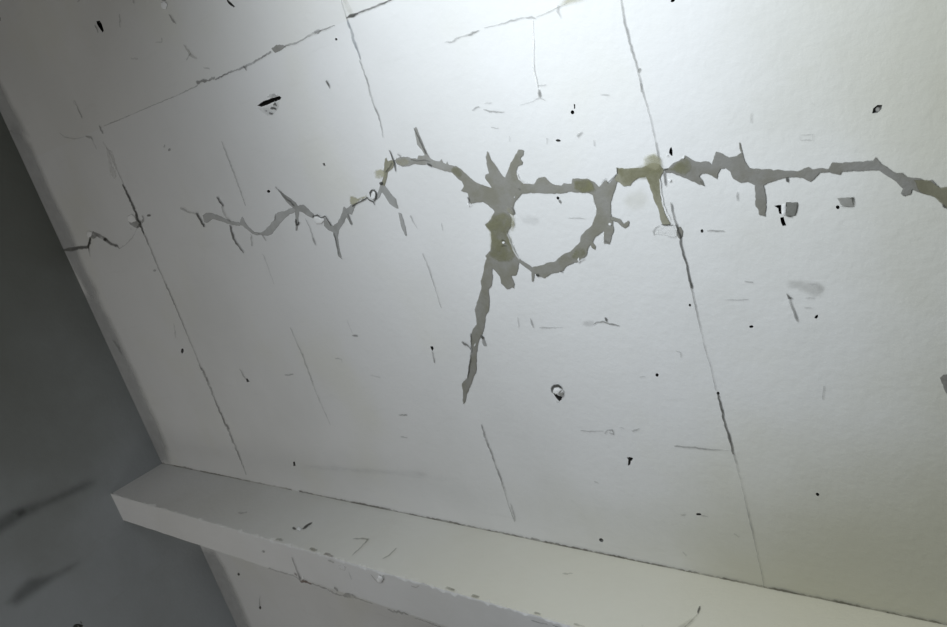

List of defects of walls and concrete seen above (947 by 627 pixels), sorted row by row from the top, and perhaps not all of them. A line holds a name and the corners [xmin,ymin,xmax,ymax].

crack [346,0,391,18]
crack [196,45,286,84]
crack [107,149,144,234]
spalling [775,202,798,226]
spalling [836,197,854,209]
crack [64,231,118,251]
crack [196,127,946,404]
crack [717,393,734,454]
crack [543,541,693,573]
crack [768,588,867,609]
crack [890,613,944,625]